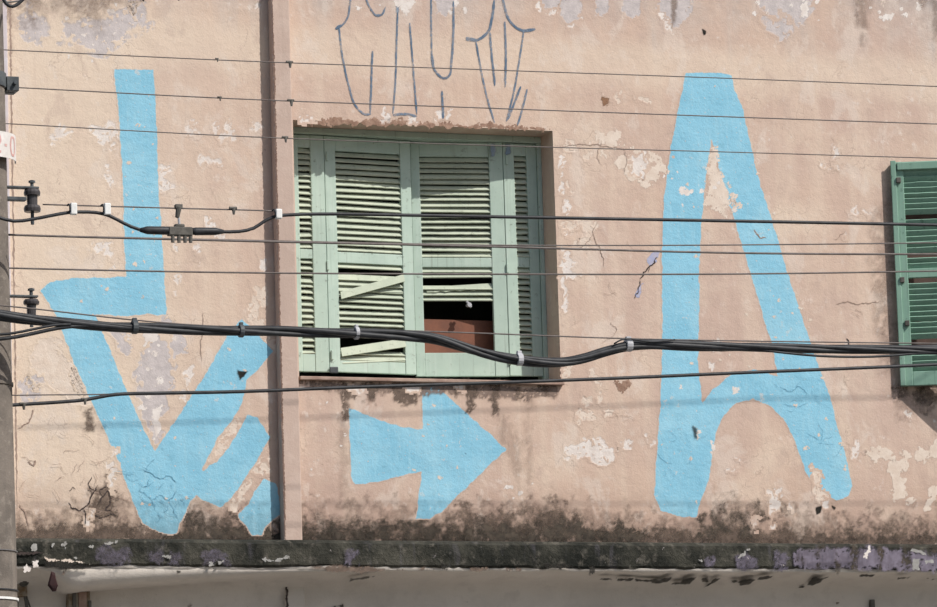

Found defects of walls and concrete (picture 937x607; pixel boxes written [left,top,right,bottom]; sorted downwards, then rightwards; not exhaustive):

crack [7,0,15,134]
peeling [14,0,159,65]
crack [563,141,627,165]
peeling [679,141,748,219]
peeling [554,129,678,326]
crack [582,223,657,296]
crack [11,159,192,526]
peeling [103,331,198,446]
water stain [298,380,557,421]
peeling [560,349,663,469]
water stain [302,503,937,574]
peeling [732,544,937,588]